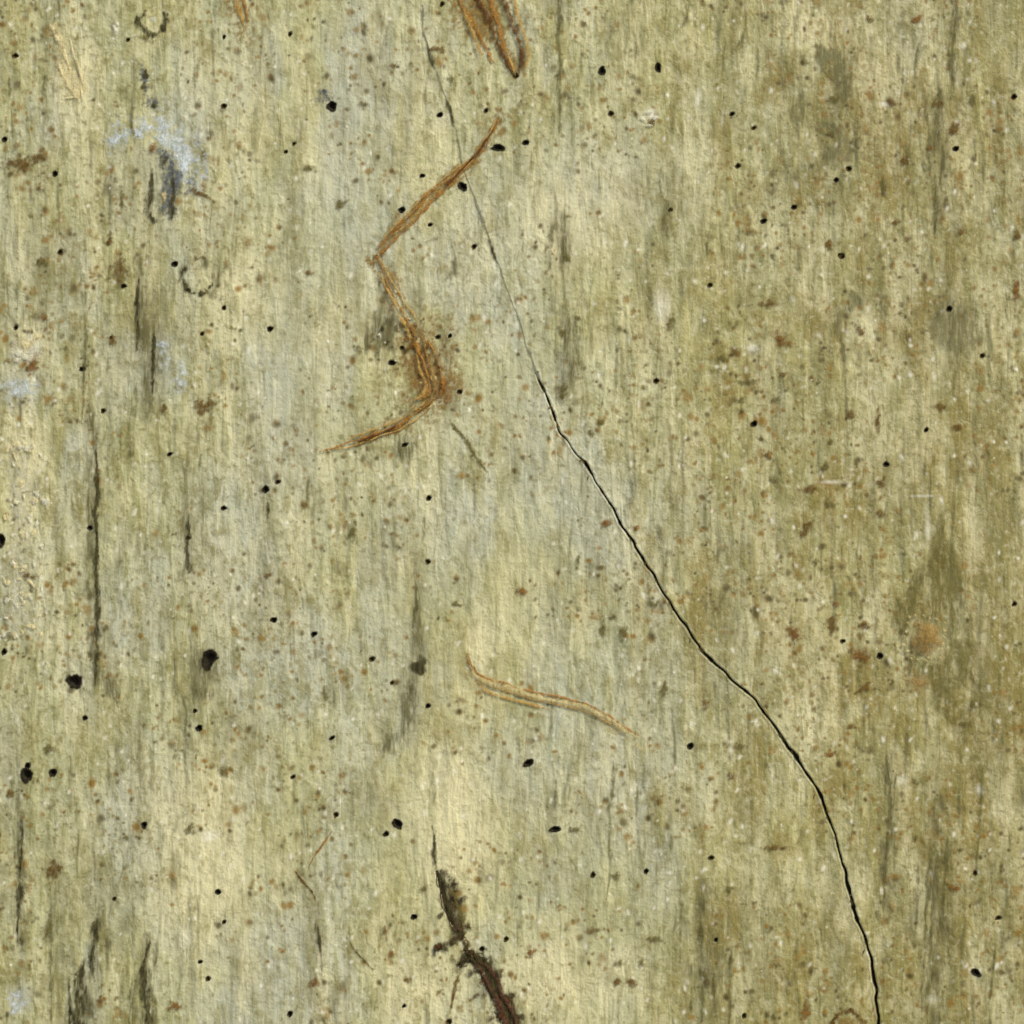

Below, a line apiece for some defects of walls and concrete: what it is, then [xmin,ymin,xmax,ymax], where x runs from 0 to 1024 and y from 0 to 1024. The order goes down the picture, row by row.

rust [450,0,530,73]
rust [320,108,502,452]
crack [421,5,883,1024]
rust [461,652,641,750]